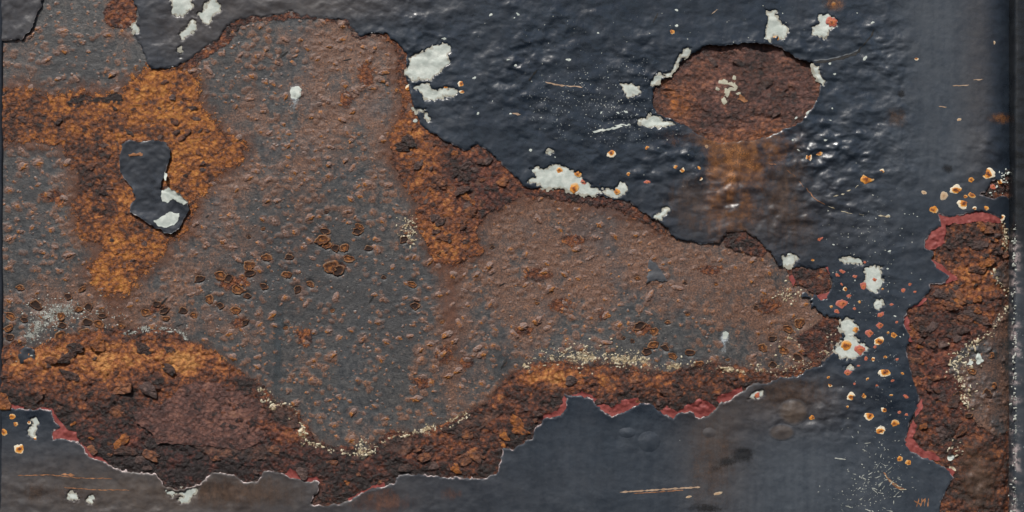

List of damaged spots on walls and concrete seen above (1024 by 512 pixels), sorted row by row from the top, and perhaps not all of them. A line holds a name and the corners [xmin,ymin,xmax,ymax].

peeling [169,0,221,58]
peeling [765,9,789,43]
peeling [404,42,458,122]
peeling [620,47,691,99]
peeling [637,112,675,129]
peeling [119,139,190,234]
peeling [527,148,628,200]
corrosion [2,0,840,451]
corrosion [830,283,851,314]
peeling [832,317,868,371]
corrosion [844,168,1010,512]
corrosion [0,317,842,506]